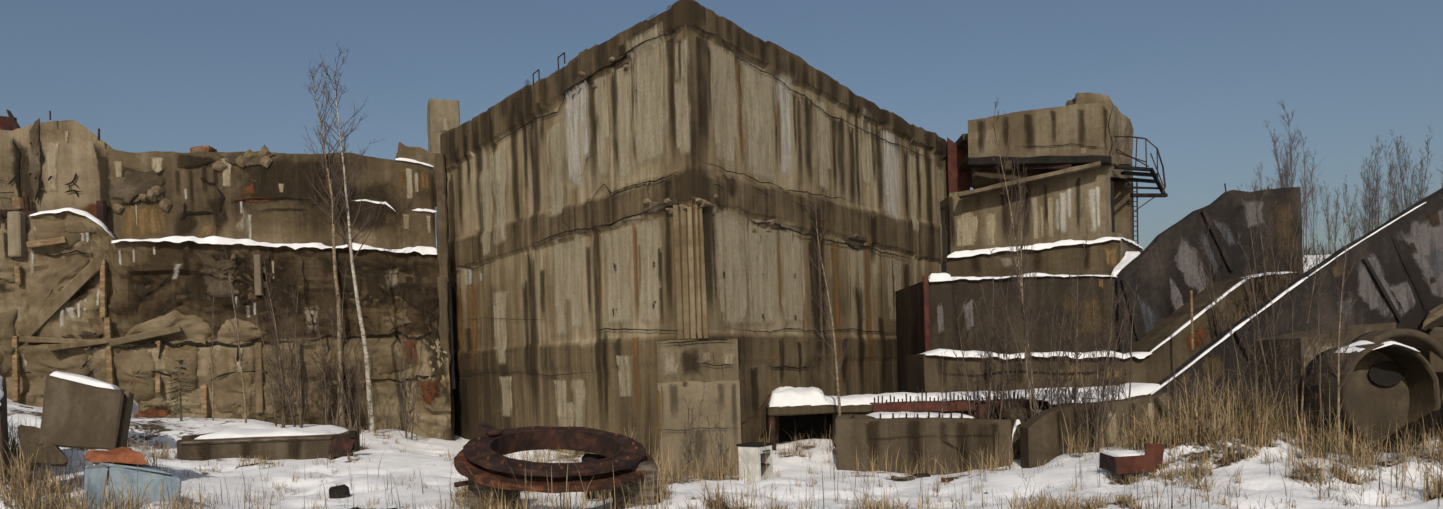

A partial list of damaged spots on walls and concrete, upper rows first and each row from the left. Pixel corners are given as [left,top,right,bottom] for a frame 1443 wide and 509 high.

crack [1,138,82,210]
crack [0,250,94,280]
spalling [109,169,172,213]
crack [120,161,305,220]
water stain [118,250,318,330]
spalling [212,144,278,171]
water stain [152,155,437,239]
crack [371,25,942,430]
water stain [454,27,1100,427]
crack [25,271,552,395]
water stain [324,259,482,422]